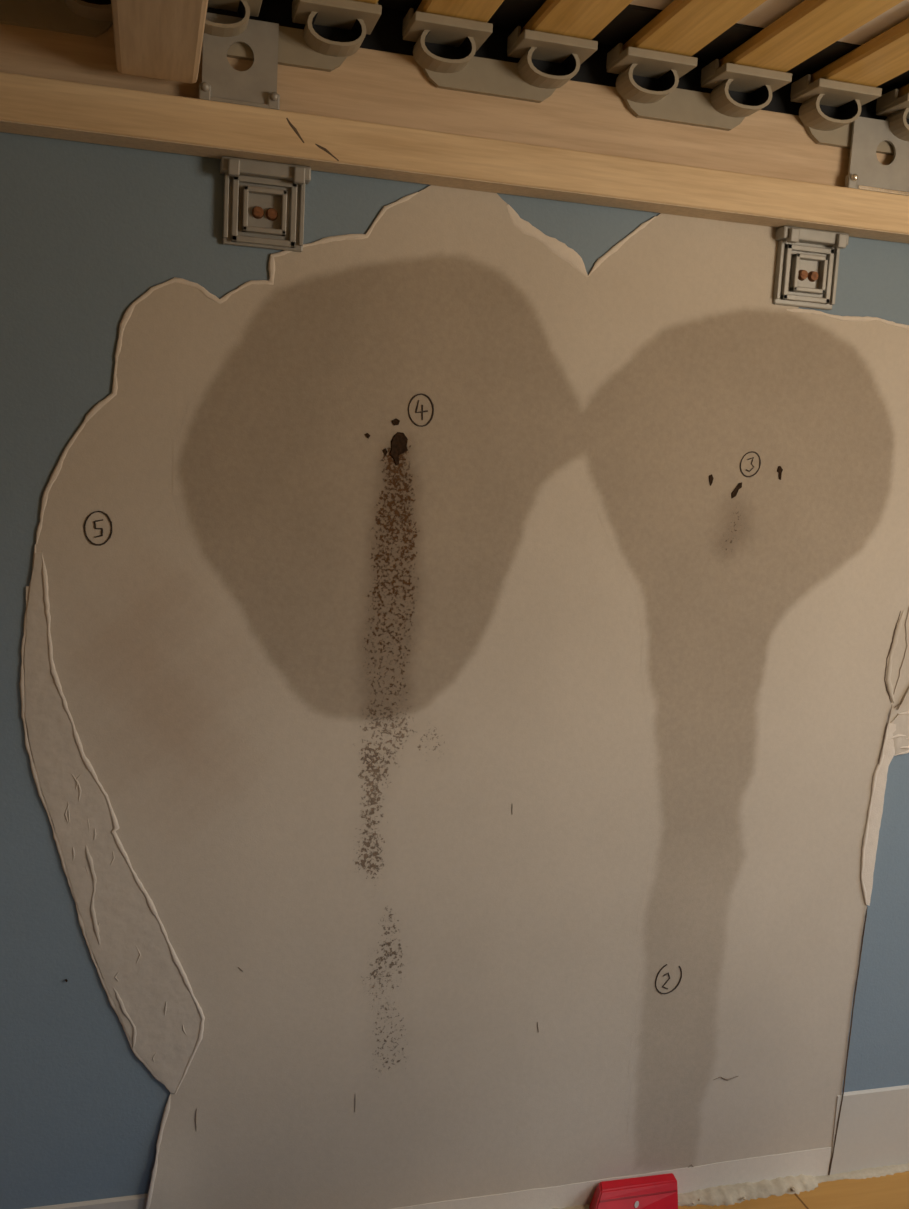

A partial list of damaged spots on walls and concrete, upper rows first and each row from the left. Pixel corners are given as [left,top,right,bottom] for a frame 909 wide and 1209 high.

leakage [32,246,901,1176]
peeling [116,308,909,1209]
crack [878,608,909,764]